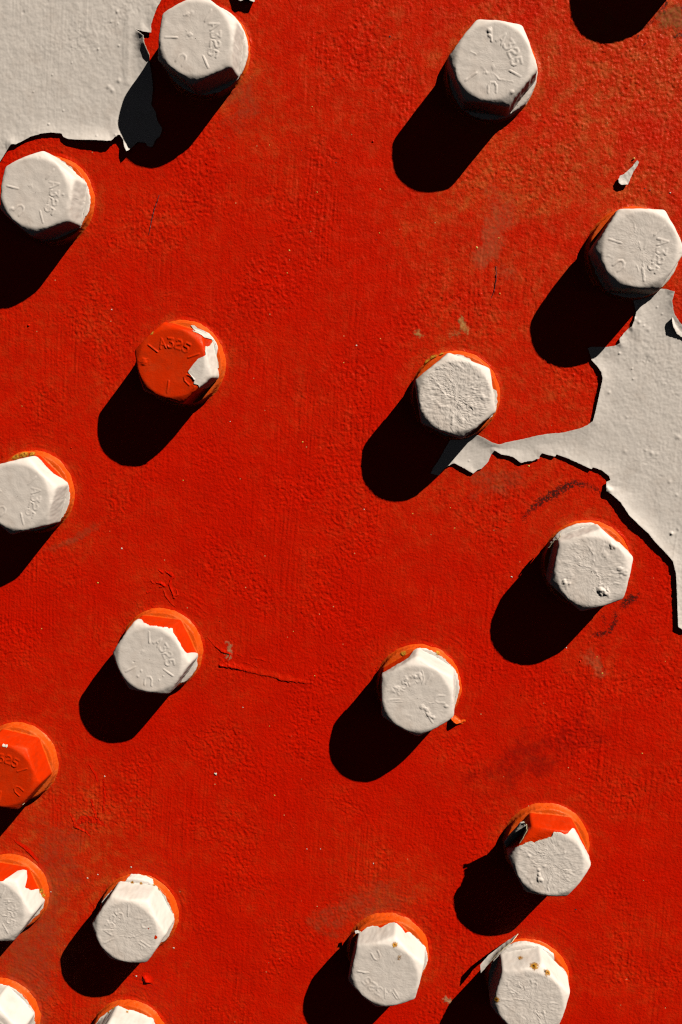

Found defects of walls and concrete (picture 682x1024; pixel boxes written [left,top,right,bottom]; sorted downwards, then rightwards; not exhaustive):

peeling [0,0,162,161]
peeling [431,289,682,629]
peeling [504,821,527,848]
peeling [480,934,518,972]